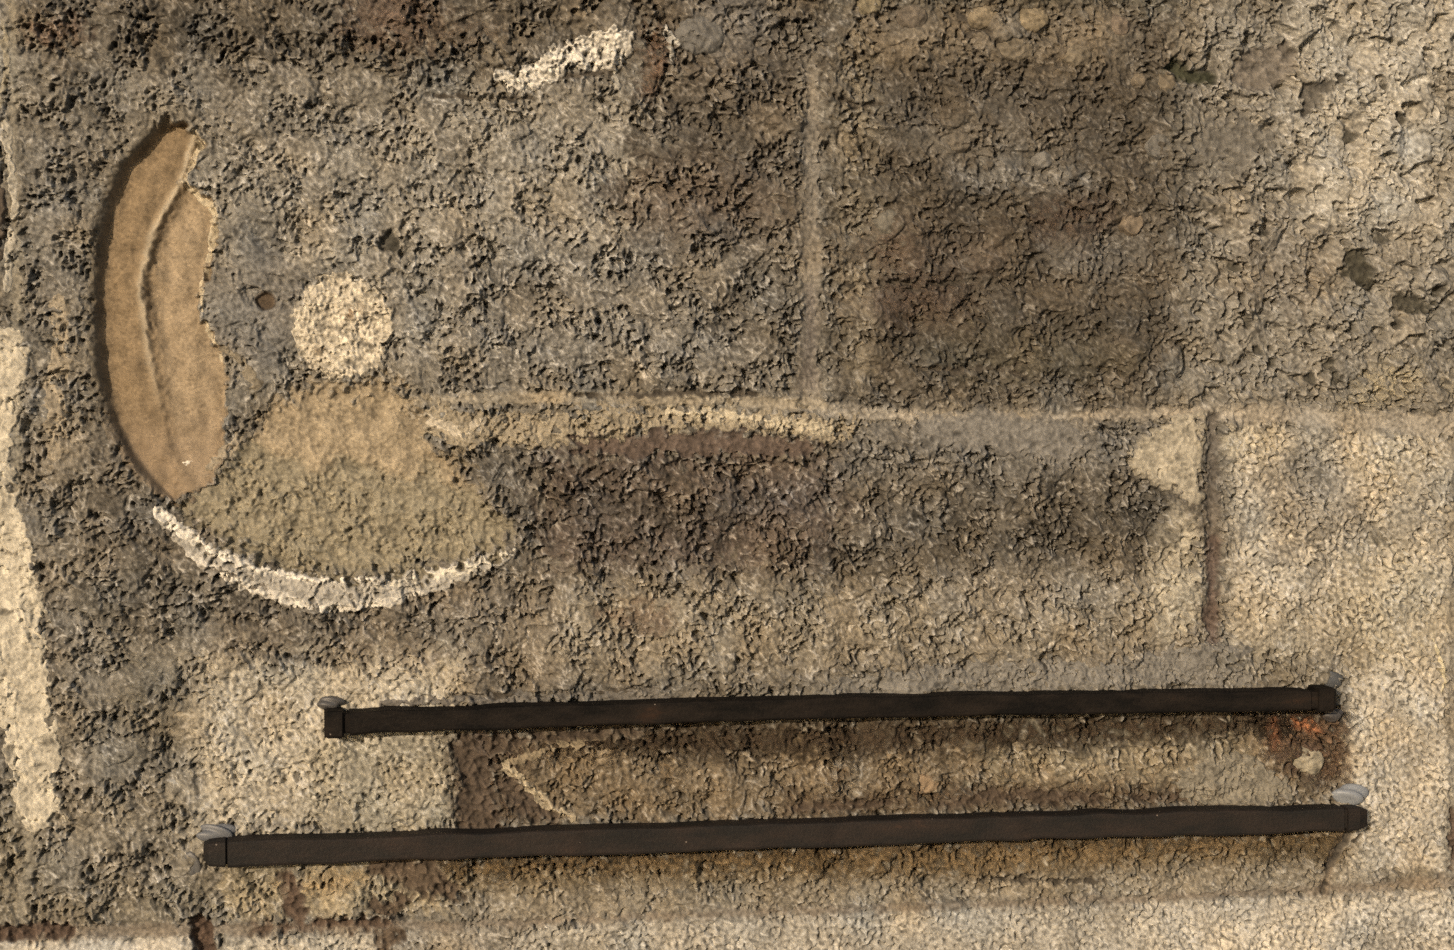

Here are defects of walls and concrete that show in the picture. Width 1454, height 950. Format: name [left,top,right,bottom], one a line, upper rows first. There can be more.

spalling [80,115,518,591]
damp [153,506,516,614]
corrosion [487,711,1340,817]